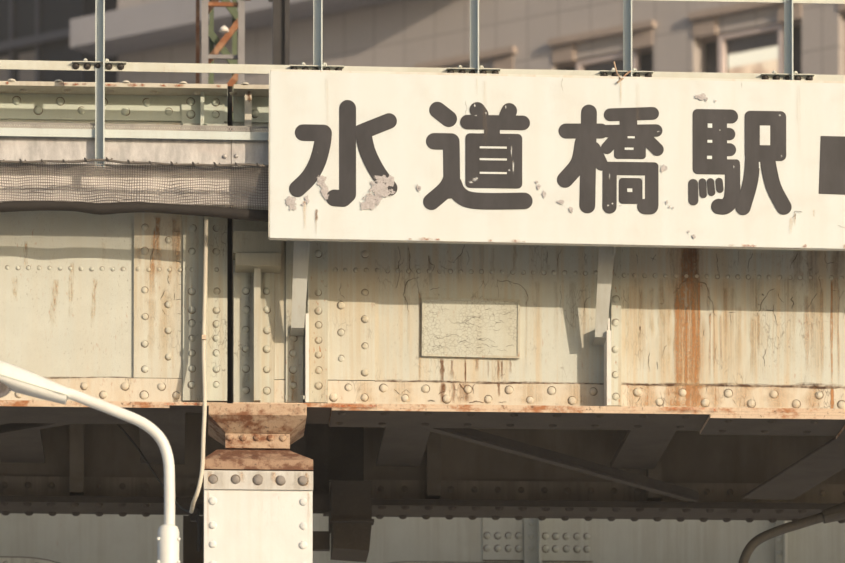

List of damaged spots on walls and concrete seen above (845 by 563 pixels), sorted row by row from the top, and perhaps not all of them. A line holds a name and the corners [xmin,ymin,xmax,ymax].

peeling [361,175,396,210]
crack [433,280,528,348]
corrosion [623,248,834,411]
corrosion [383,360,601,400]